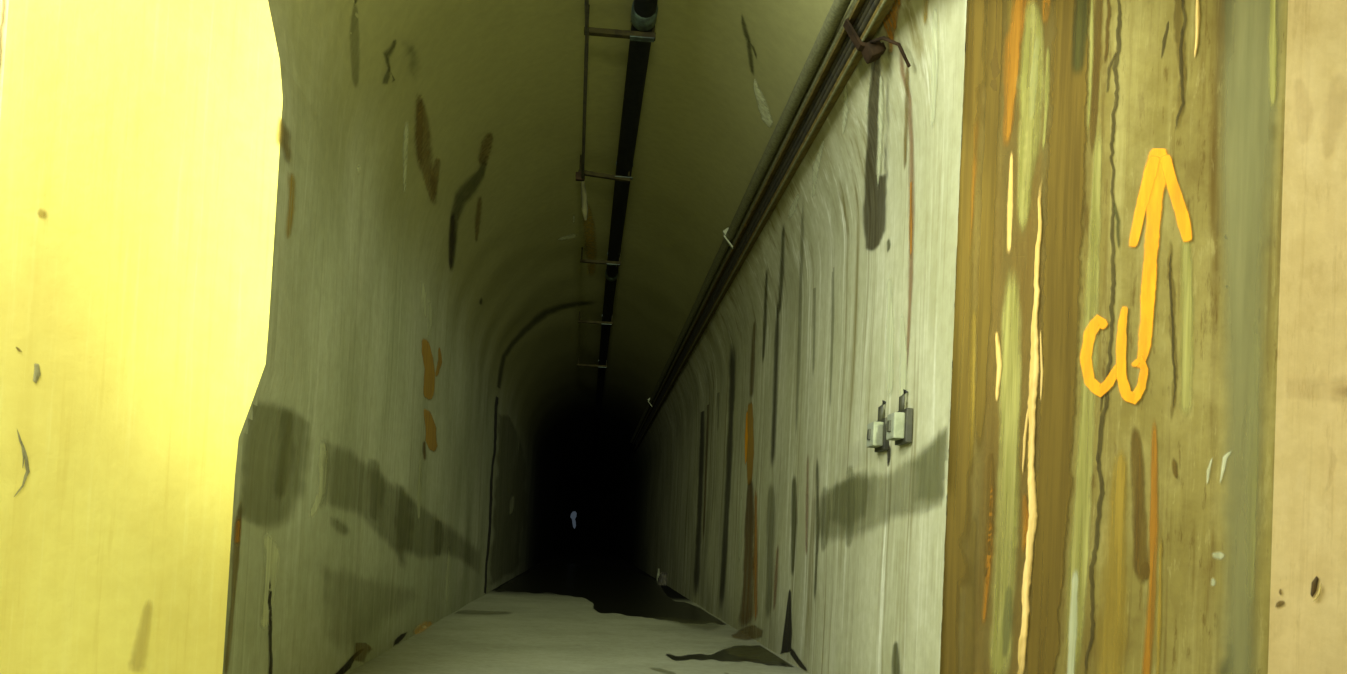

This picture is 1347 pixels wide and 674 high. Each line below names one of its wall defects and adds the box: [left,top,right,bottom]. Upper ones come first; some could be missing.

corrosion [416,99,440,201]
water stain [762,141,824,460]
water stain [864,59,890,250]
corrosion [882,0,914,360]
corrosion [940,0,1102,674]
crack [1085,0,1122,669]
corrosion [732,482,762,640]
water stain [774,460,819,606]
corrosion [1103,426,1162,674]